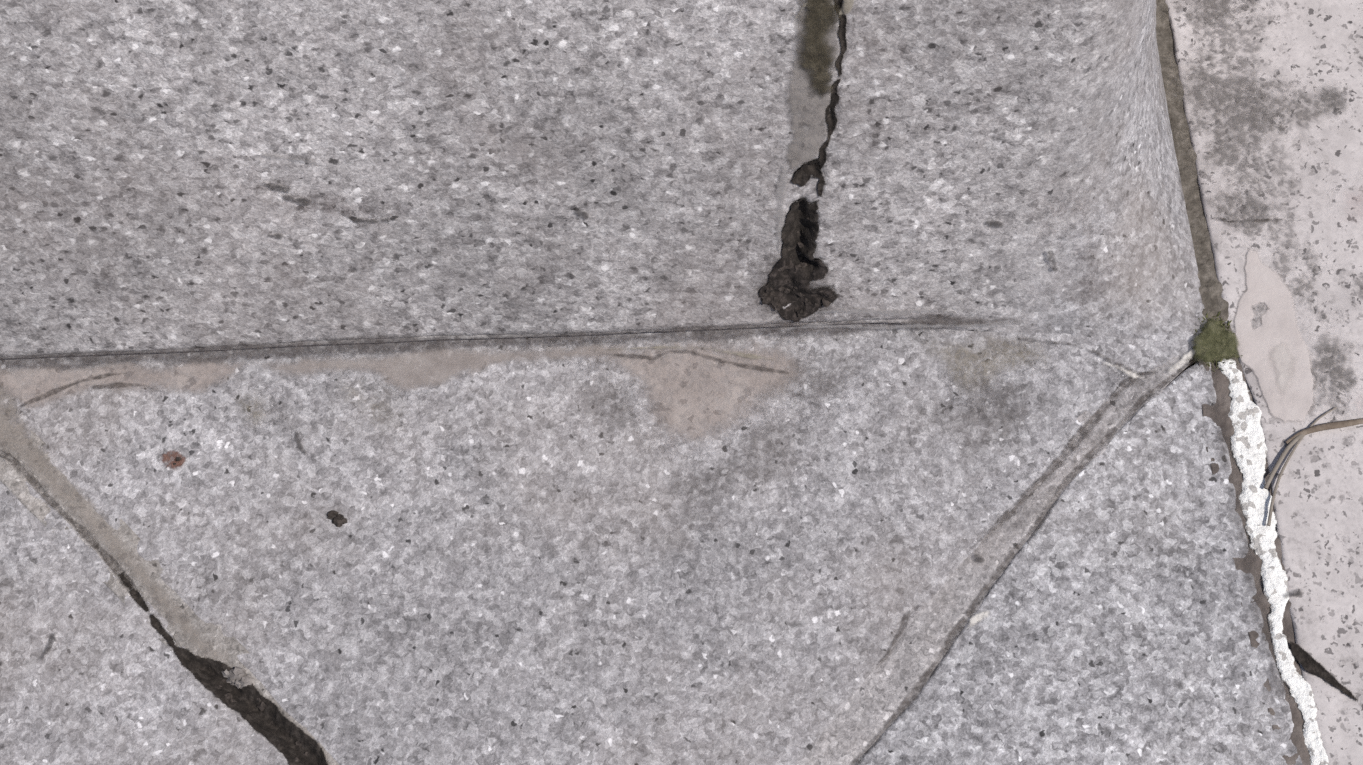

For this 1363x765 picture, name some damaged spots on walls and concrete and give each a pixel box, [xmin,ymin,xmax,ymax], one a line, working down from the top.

crack [759,0,847,322]
crack [5,454,328,765]
crack [1290,641,1358,701]